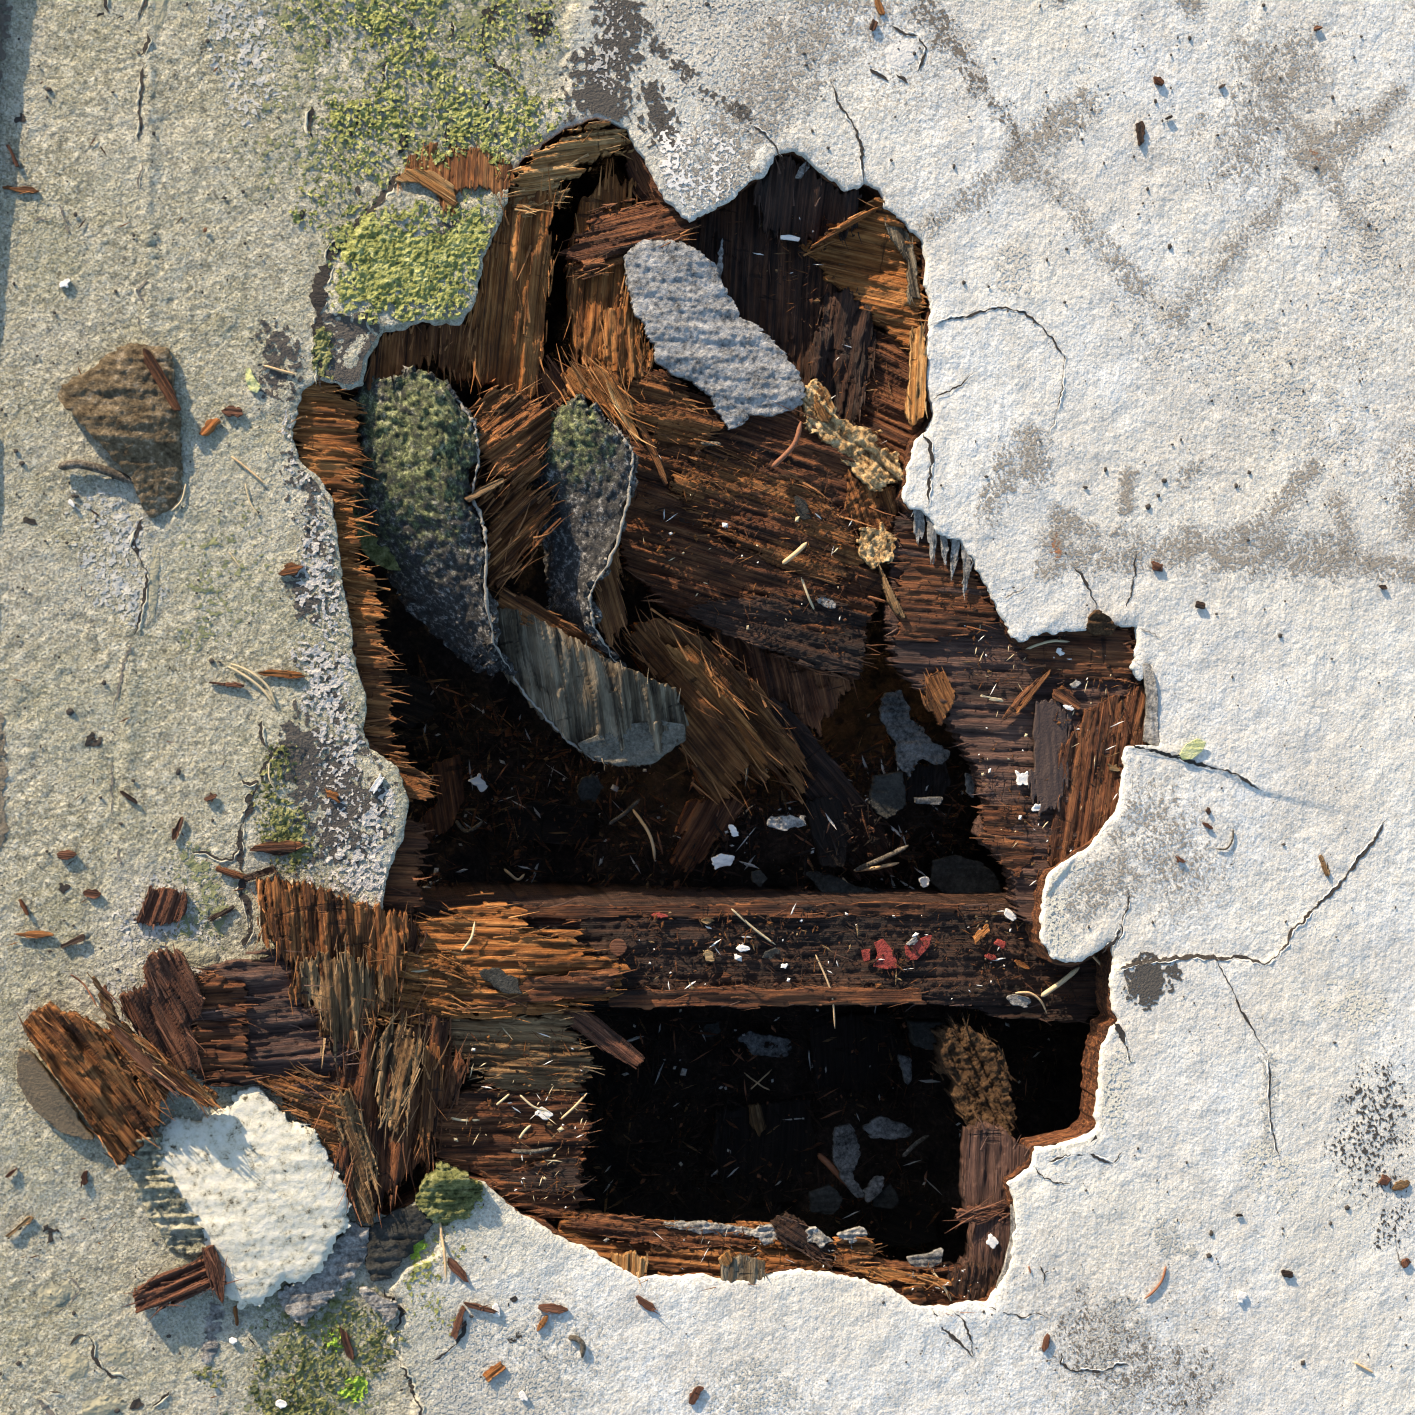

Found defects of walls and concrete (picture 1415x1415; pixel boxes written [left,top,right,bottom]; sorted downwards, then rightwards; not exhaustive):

water stain [625,0,1415,331]
peeling [249,320,304,406]
peeling [316,312,382,384]
crack [931,306,1067,434]
water stain [965,291,1415,593]
peeling [279,428,340,624]
peeling [267,650,401,866]
peeling [878,690,950,777]
peeling [766,815,806,831]
crack [1102,820,1386,1166]
peeling [808,1115,913,1214]
crack [1036,1135,1122,1184]